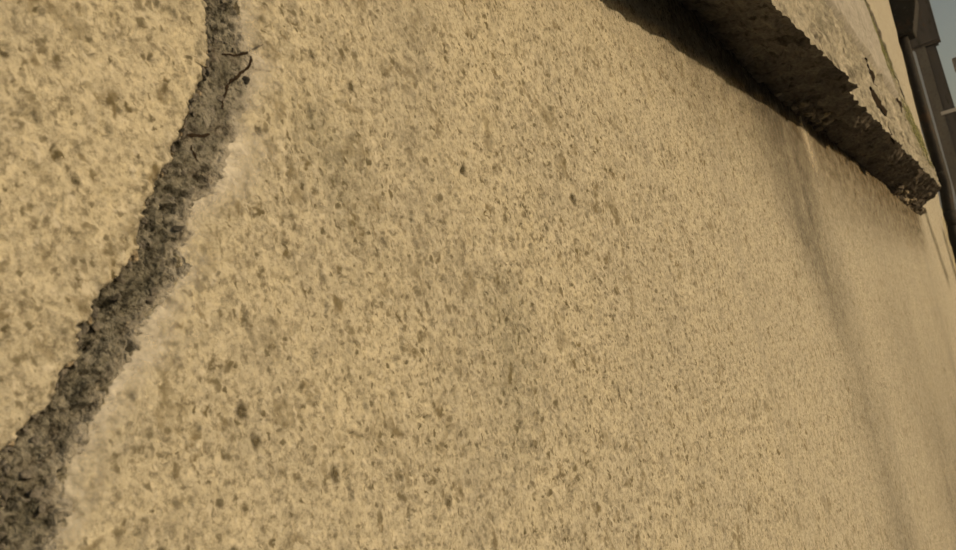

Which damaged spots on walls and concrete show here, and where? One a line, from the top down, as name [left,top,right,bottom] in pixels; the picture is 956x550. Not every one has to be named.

flaking render [825,0,898,99]
damp [176,128,247,257]
spalling [890,184,927,216]
crack [0,0,271,550]
damp [64,305,166,498]